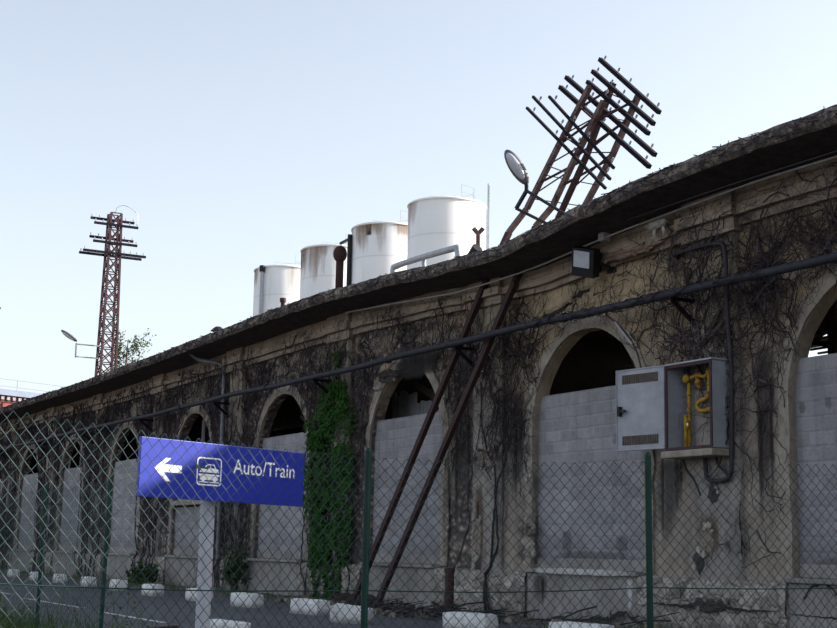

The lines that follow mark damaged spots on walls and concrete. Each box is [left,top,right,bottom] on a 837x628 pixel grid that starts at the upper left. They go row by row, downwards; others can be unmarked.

flaking render [690,521,715,575]
spalling [689,596,730,613]